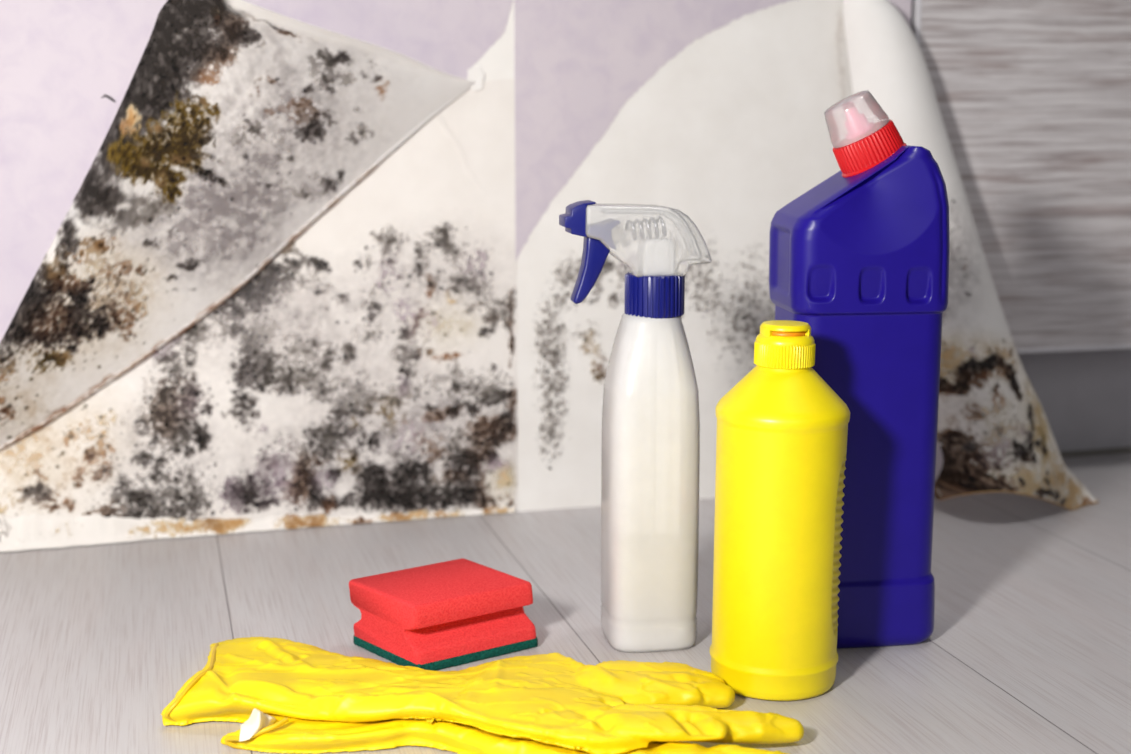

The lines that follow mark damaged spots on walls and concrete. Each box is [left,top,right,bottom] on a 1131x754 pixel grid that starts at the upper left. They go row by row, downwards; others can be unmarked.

peeling [0,0,475,449]
water stain [0,222,517,521]
water stain [534,220,775,470]
water stain [934,383,1092,509]
peeling [1012,403,1066,506]